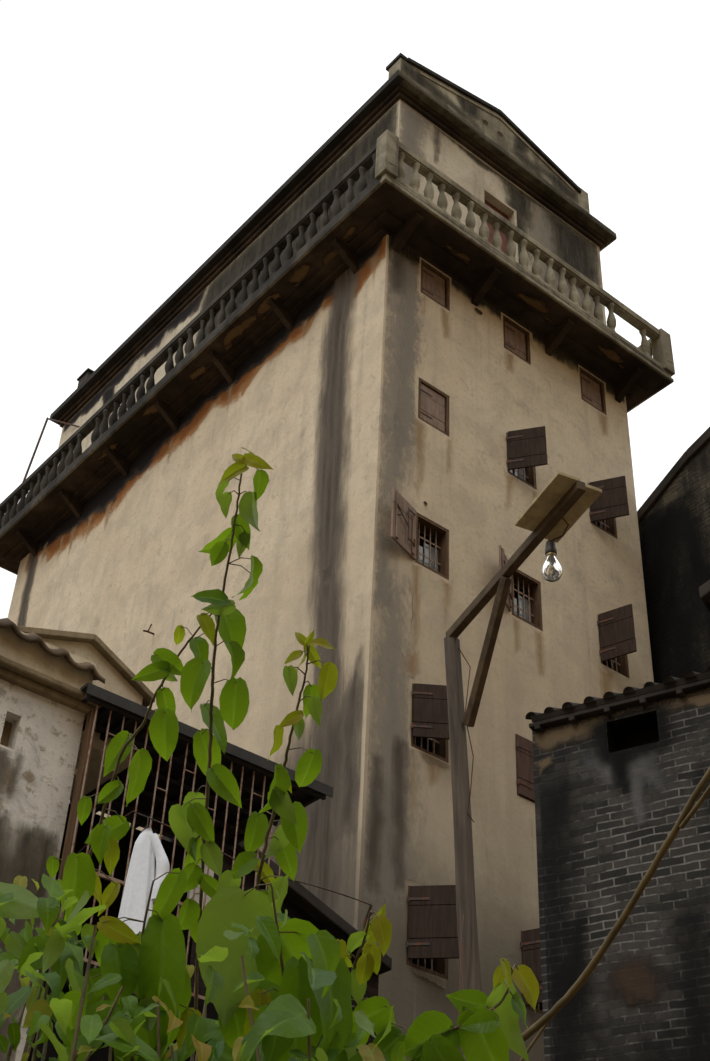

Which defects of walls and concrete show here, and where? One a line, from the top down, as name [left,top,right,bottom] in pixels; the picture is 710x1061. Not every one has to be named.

rust [352,235,386,300]
rust [25,278,339,571]
damp [286,268,414,925]
damp [0,747,22,797]
damp [0,816,57,898]
damp [259,821,281,866]
damp [0,917,41,953]
damp [4,963,28,995]
damp [0,1007,21,1061]